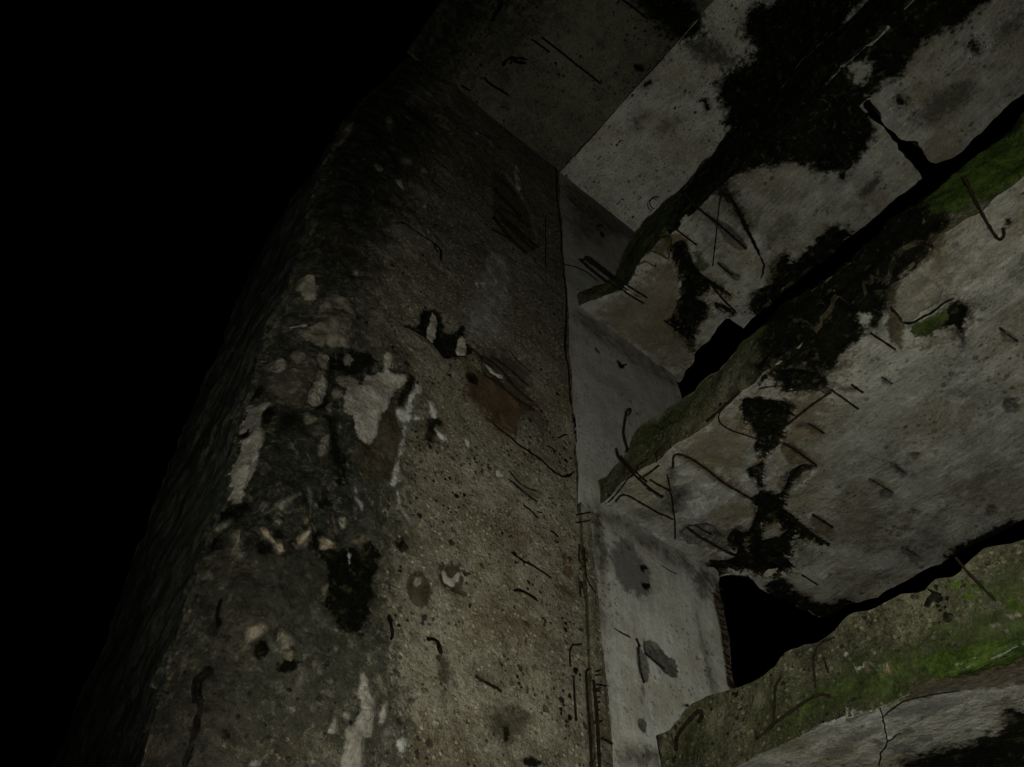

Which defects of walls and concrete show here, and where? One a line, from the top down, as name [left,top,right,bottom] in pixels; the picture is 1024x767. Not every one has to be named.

leakage [566,0,991,386]
crack [729,195,765,278]
leakage [143,0,536,767]
peeling [304,352,407,445]
spalling [404,309,536,412]
peeling [218,402,273,504]
peeling [260,492,335,555]
spalling [439,562,475,603]
leakage [763,578,854,618]
crack [924,588,942,608]
crack [878,690,960,767]
leakage [814,707,1024,767]